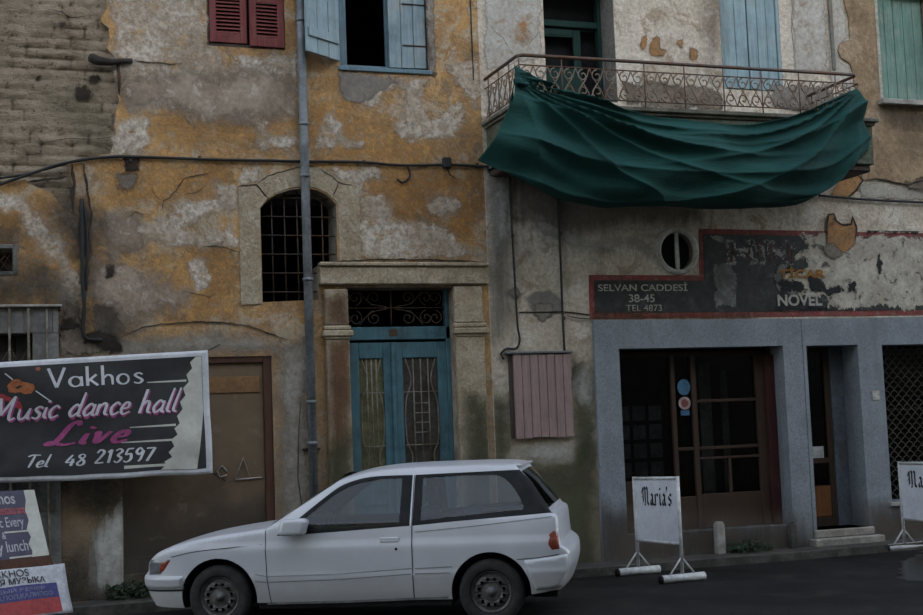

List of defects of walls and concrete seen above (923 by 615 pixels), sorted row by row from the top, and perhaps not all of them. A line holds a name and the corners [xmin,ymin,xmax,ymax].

peeling [365,0,542,143]
spalling [640,35,666,56]
spalling [677,39,698,60]
peeling [315,111,364,149]
spalling [0,0,298,356]
crack [129,173,208,217]
peeling [332,165,484,261]
peeling [713,263,738,308]
peeling [774,215,923,312]
crack [121,321,289,341]
leakage [531,365,799,563]
leakage [872,510,923,540]